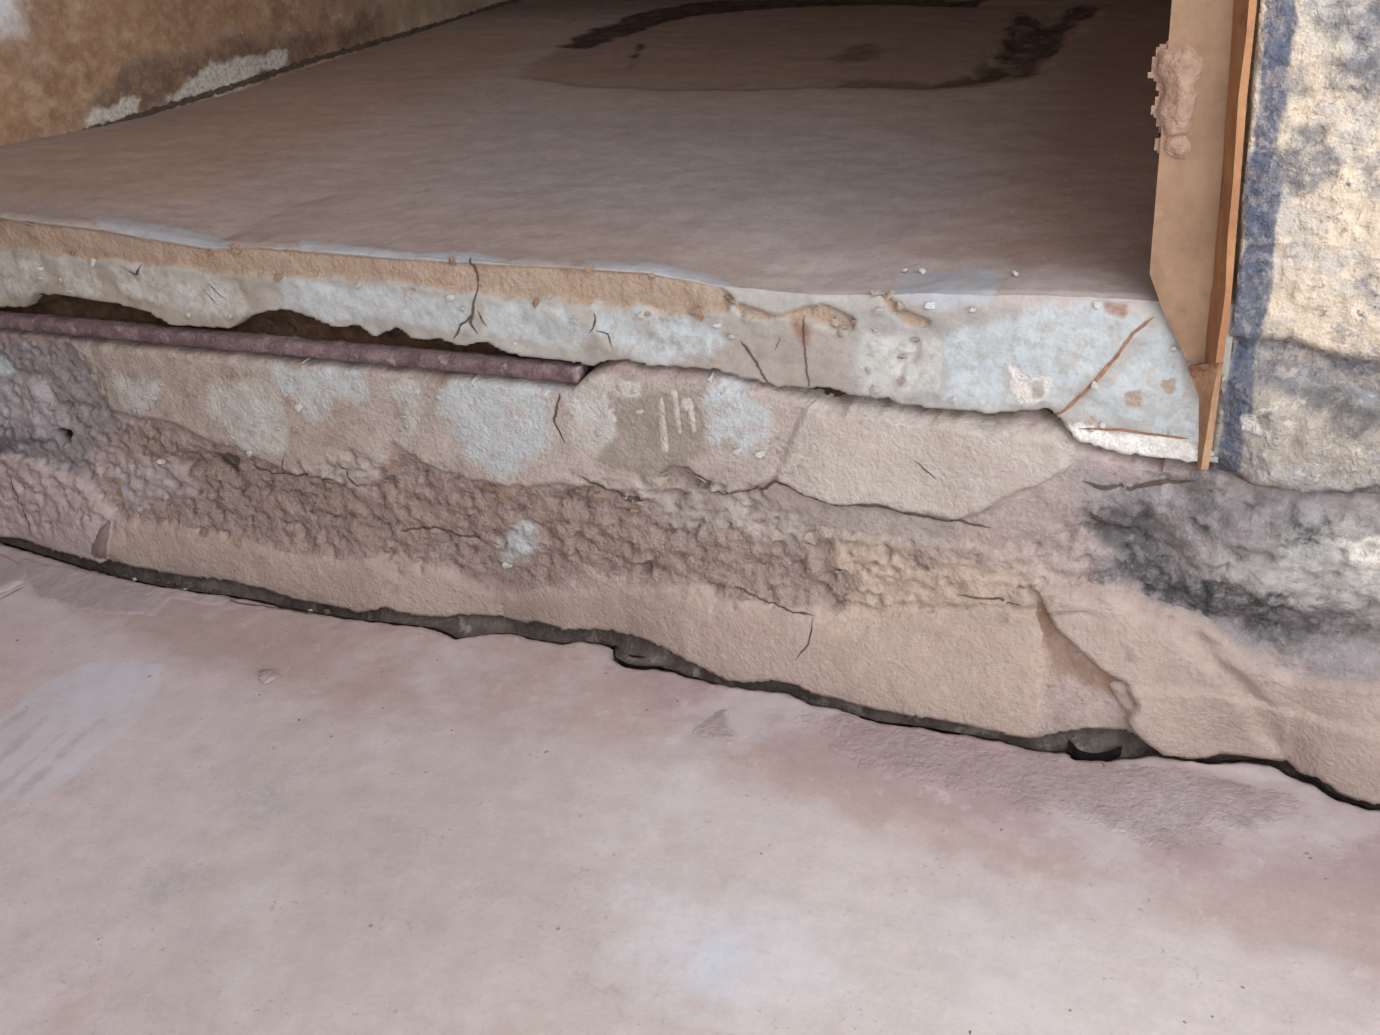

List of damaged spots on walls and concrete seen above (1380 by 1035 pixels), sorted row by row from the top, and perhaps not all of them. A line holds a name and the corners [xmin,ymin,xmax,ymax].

damp [0,0,515,146]
crack [0,257,520,357]
crack [252,457,365,488]
crack [553,312,614,444]
spalling [0,214,1215,616]
crack [741,315,847,398]
crack [1045,317,1189,439]
damp [1123,388,1145,409]
damp [1159,377,1177,396]
damp [1062,412,1380,668]
crack [0,476,1380,810]